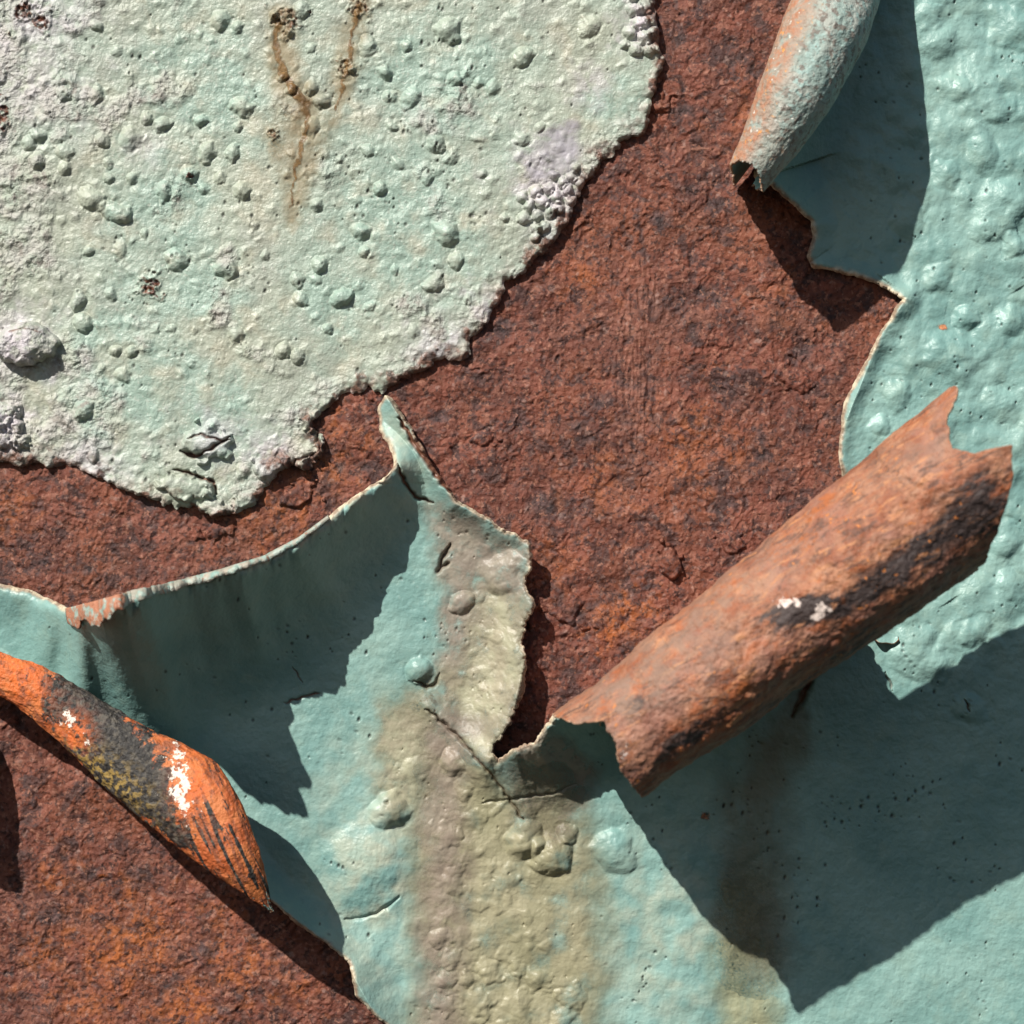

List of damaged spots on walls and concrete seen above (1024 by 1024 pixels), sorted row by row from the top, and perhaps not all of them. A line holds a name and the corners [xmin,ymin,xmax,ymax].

peeling [0,0,53,40]
peeling [264,3,312,41]
peeling [0,94,12,136]
peeling [266,127,280,141]
peeling [133,268,168,302]
corrosion [0,0,902,759]
crack [173,433,231,495]
peeling [178,417,248,466]
peeling [198,411,324,518]
peeling [875,632,899,644]
crack [414,675,576,821]
corrosion [0,697,385,1024]